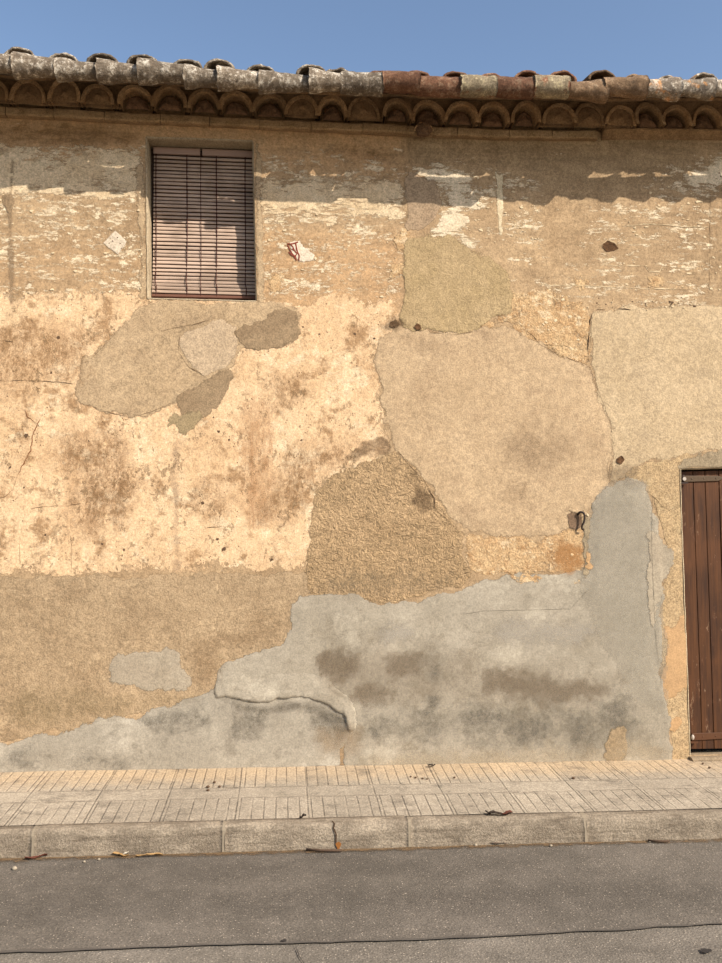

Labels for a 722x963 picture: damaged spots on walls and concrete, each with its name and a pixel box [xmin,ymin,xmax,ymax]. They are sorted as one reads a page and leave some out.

peeling [412,163,496,249]
peeling [625,152,722,241]
peeling [481,262,703,364]
peeling [0,143,410,577]
crack [527,308,630,476]
water stain [350,437,390,458]
peeling [465,514,593,584]
spalling [603,726,628,761]